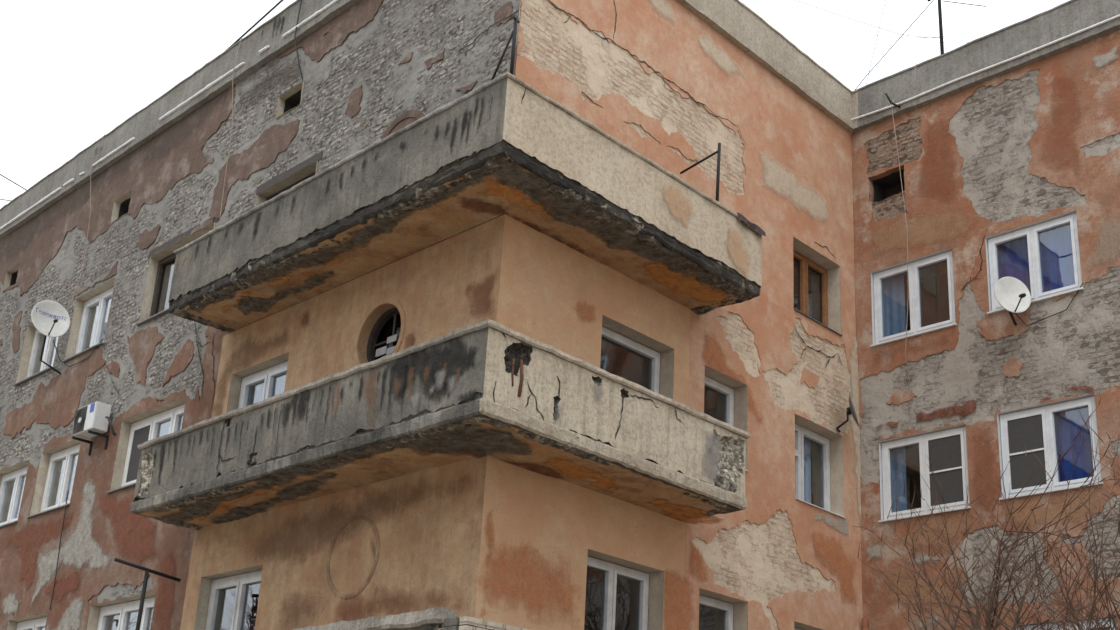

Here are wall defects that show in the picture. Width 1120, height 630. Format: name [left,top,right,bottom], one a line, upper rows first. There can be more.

crack [455,9,519,54]
crack [549,0,741,132]
water stain [424,98,493,148]
flaking render [0,0,1120,485]
water stain [147,376,363,484]
peeling [137,415,640,530]
water stain [377,339,475,411]
crack [525,376,560,420]
crack [577,395,682,442]
peeling [3,480,111,614]
flaking render [683,429,836,630]
flaking render [958,524,1059,607]